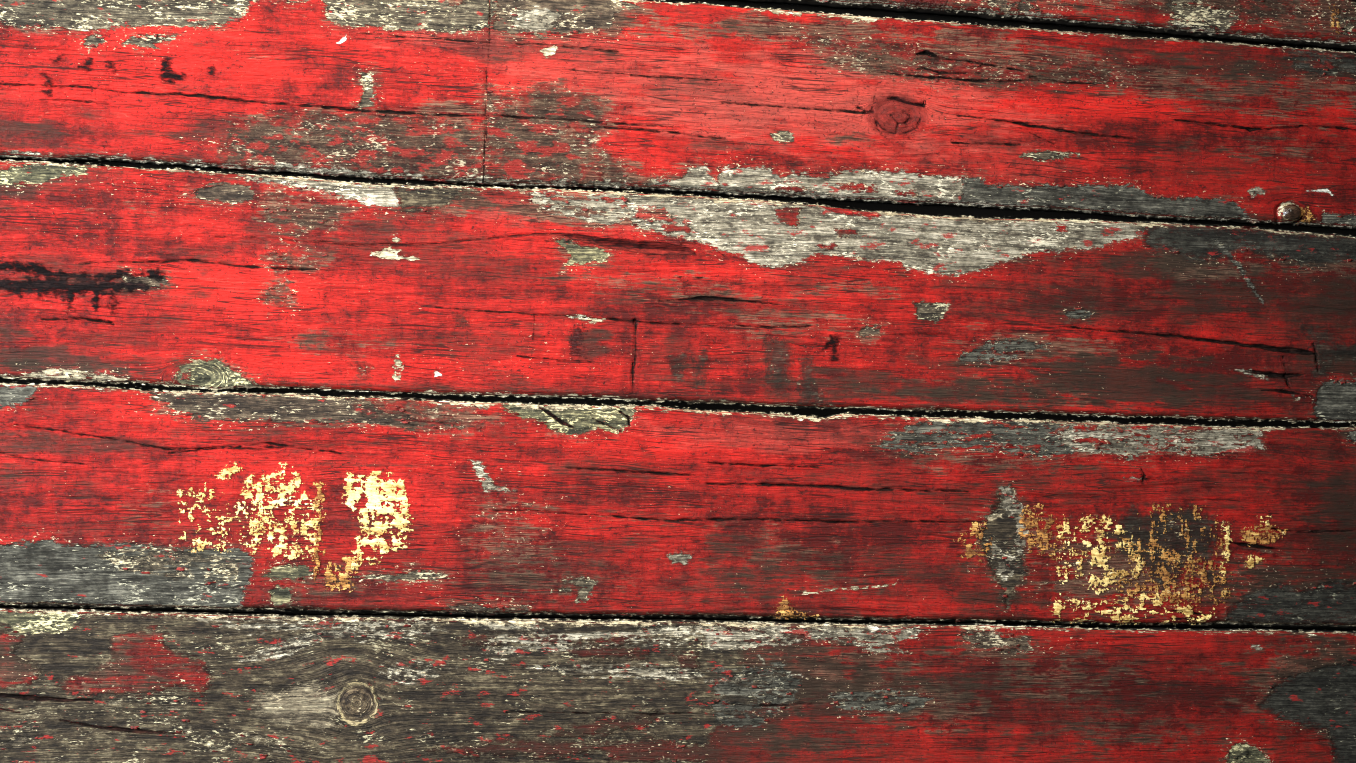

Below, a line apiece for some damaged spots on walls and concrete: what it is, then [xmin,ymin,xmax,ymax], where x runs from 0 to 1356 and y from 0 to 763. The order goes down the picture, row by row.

peeling [0,0,259,52]
peeling [278,0,641,58]
peeling [190,72,1356,277]
crack [82,233,812,429]
peeling [0,368,130,409]
peeling [149,357,484,431]
spalling [502,404,636,435]
peeling [878,420,1264,461]
peeling [976,485,1029,610]
peeling [1171,505,1228,578]
peeling [0,512,934,763]
peeling [1147,579,1356,625]